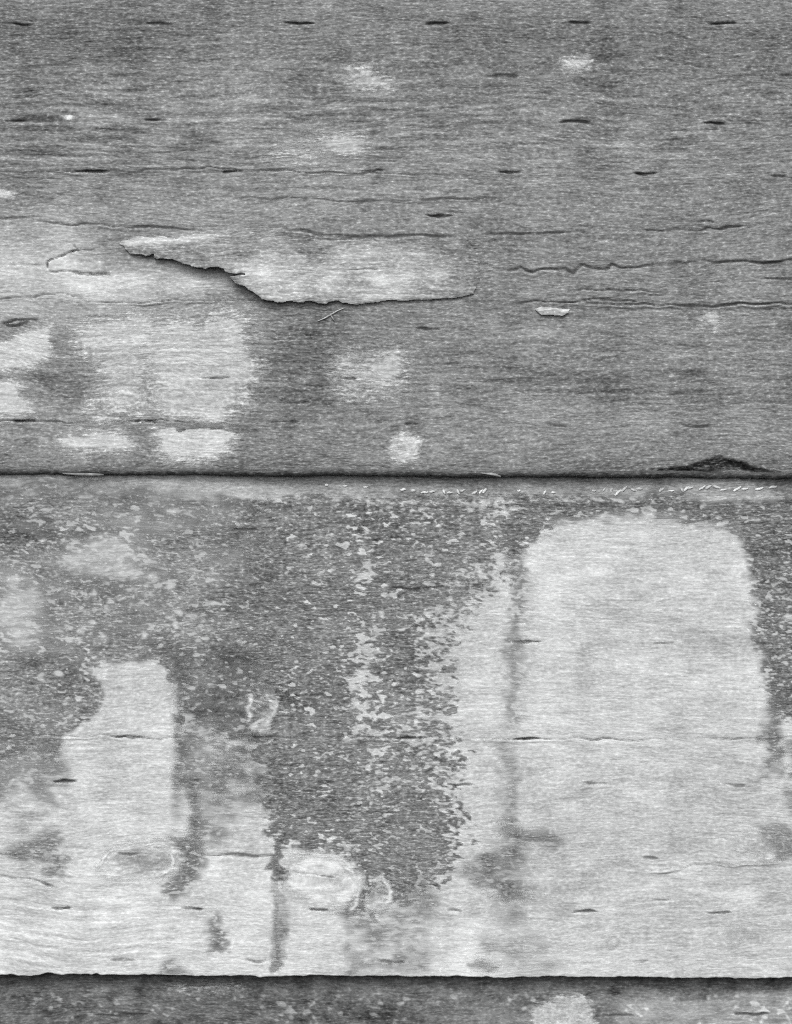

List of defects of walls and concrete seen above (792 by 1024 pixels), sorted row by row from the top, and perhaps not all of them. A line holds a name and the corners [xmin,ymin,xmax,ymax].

peeling [119,226,483,305]
peeling [535,306,570,316]
crack [508,260,792,307]
leakage [0,481,792,975]